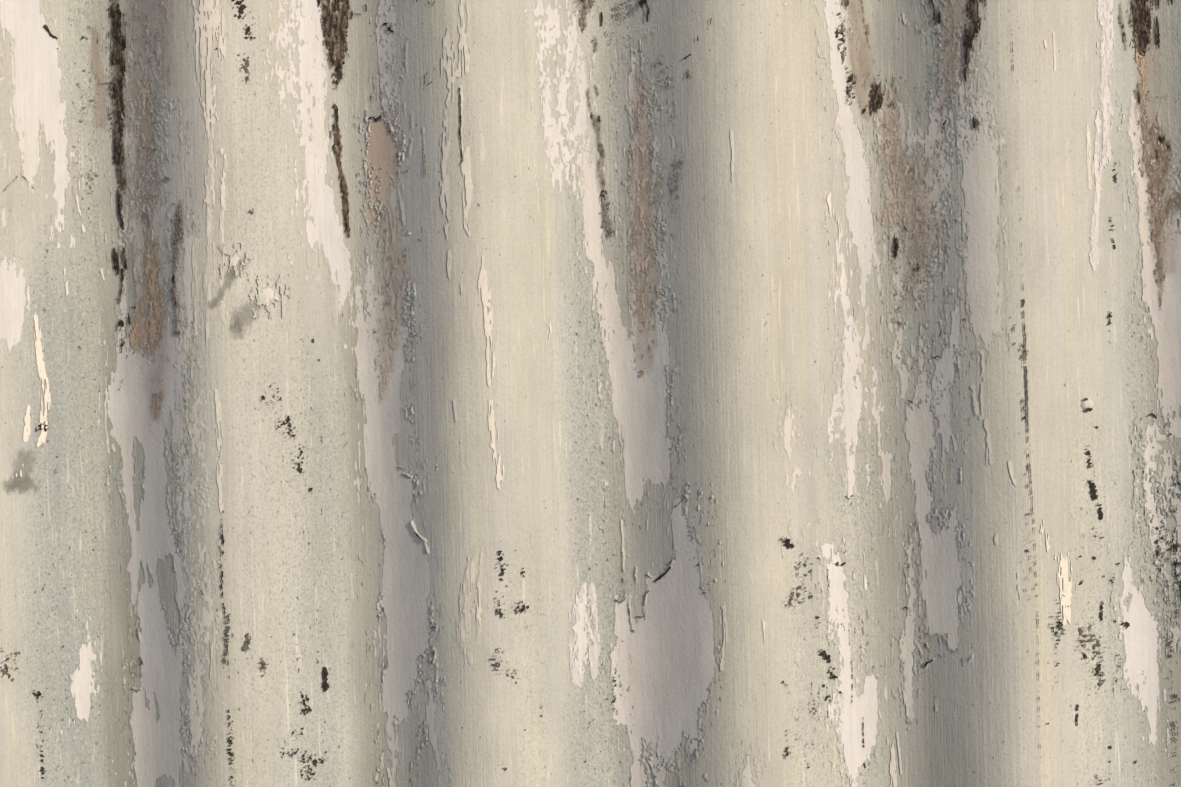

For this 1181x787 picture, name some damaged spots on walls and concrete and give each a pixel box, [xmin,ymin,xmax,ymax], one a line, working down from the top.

peeling [0,0,271,787]
corrosion [126,229,167,354]
peeling [219,0,451,787]
peeling [524,0,729,787]
peeling [706,0,1010,787]
peeling [1047,88,1181,787]
corrosion [1134,48,1181,310]